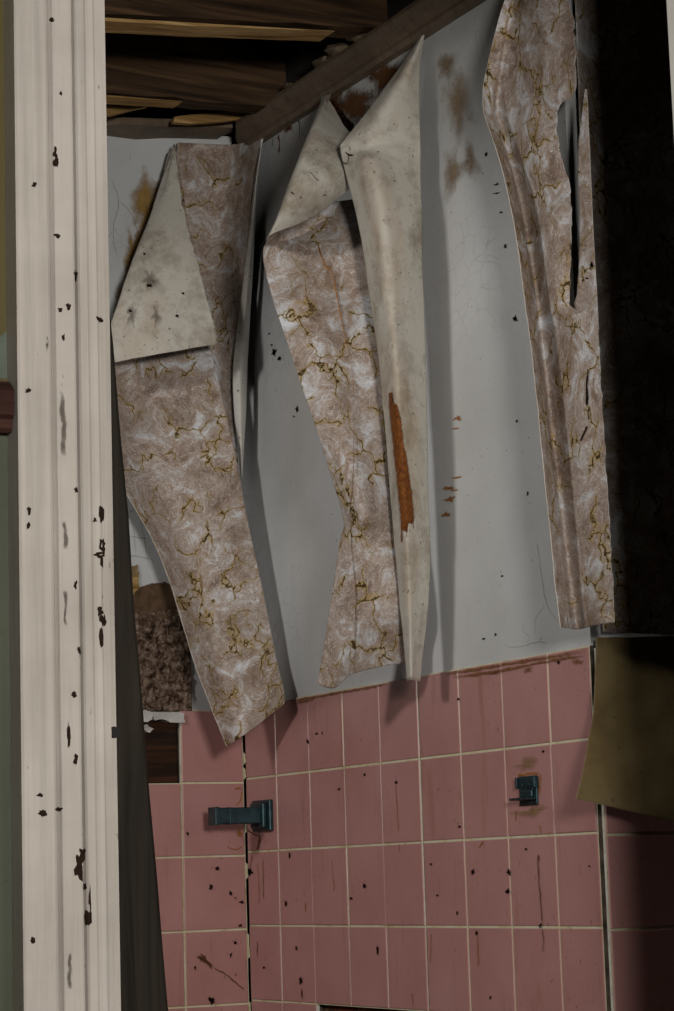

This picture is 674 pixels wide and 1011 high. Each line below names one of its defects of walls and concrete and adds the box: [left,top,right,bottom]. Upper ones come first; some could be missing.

peeling [330,99,354,132]
leakage [449,149,473,183]
spalling [132,564,192,733]